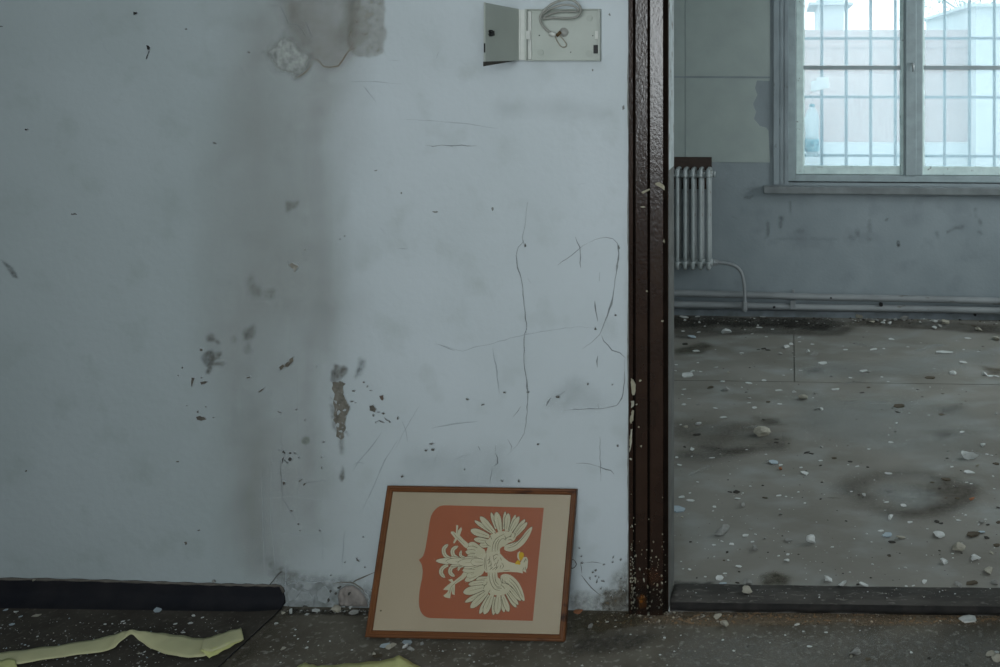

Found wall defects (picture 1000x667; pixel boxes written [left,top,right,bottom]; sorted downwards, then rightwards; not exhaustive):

peeling [322,365,399,443]
crack [429,203,625,445]